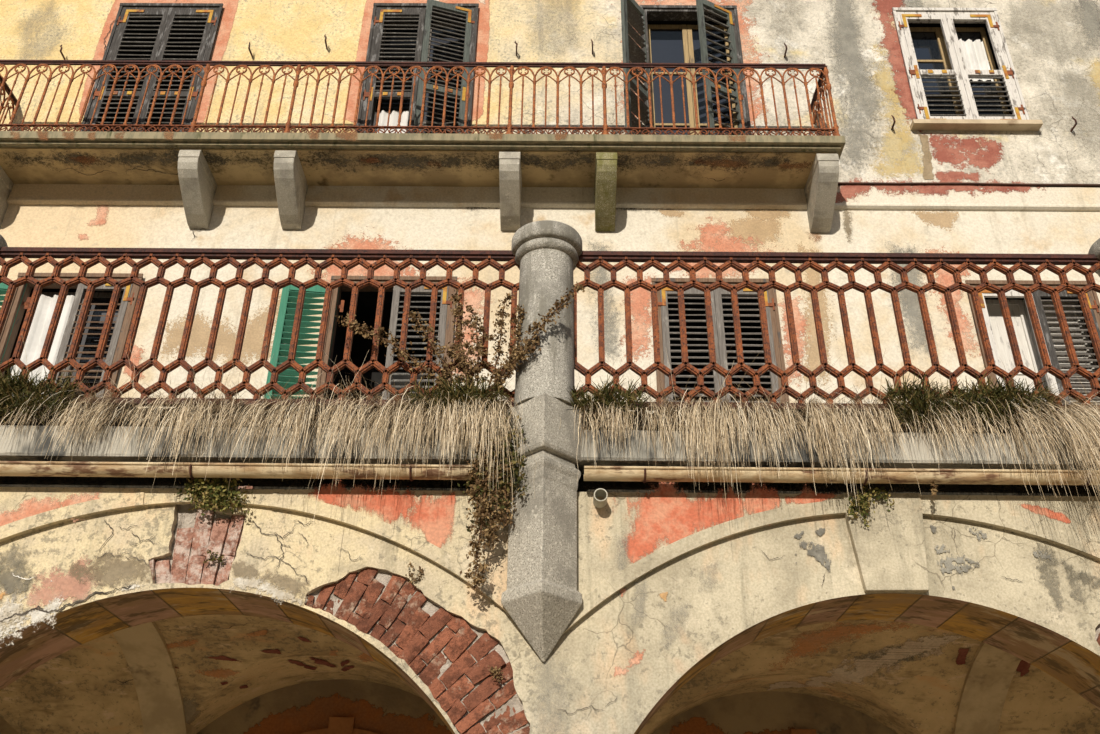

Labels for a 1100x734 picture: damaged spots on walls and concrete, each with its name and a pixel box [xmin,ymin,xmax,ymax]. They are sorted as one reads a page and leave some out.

peeling [869,44,1004,182]
spalling [148,504,246,592]
crack [240,520,310,582]
peeling [309,484,455,548]
peeling [624,482,835,563]
spalling [794,528,831,572]
peeling [1021,504,1070,523]
water stain [0,543,63,645]
spalling [261,566,530,734]